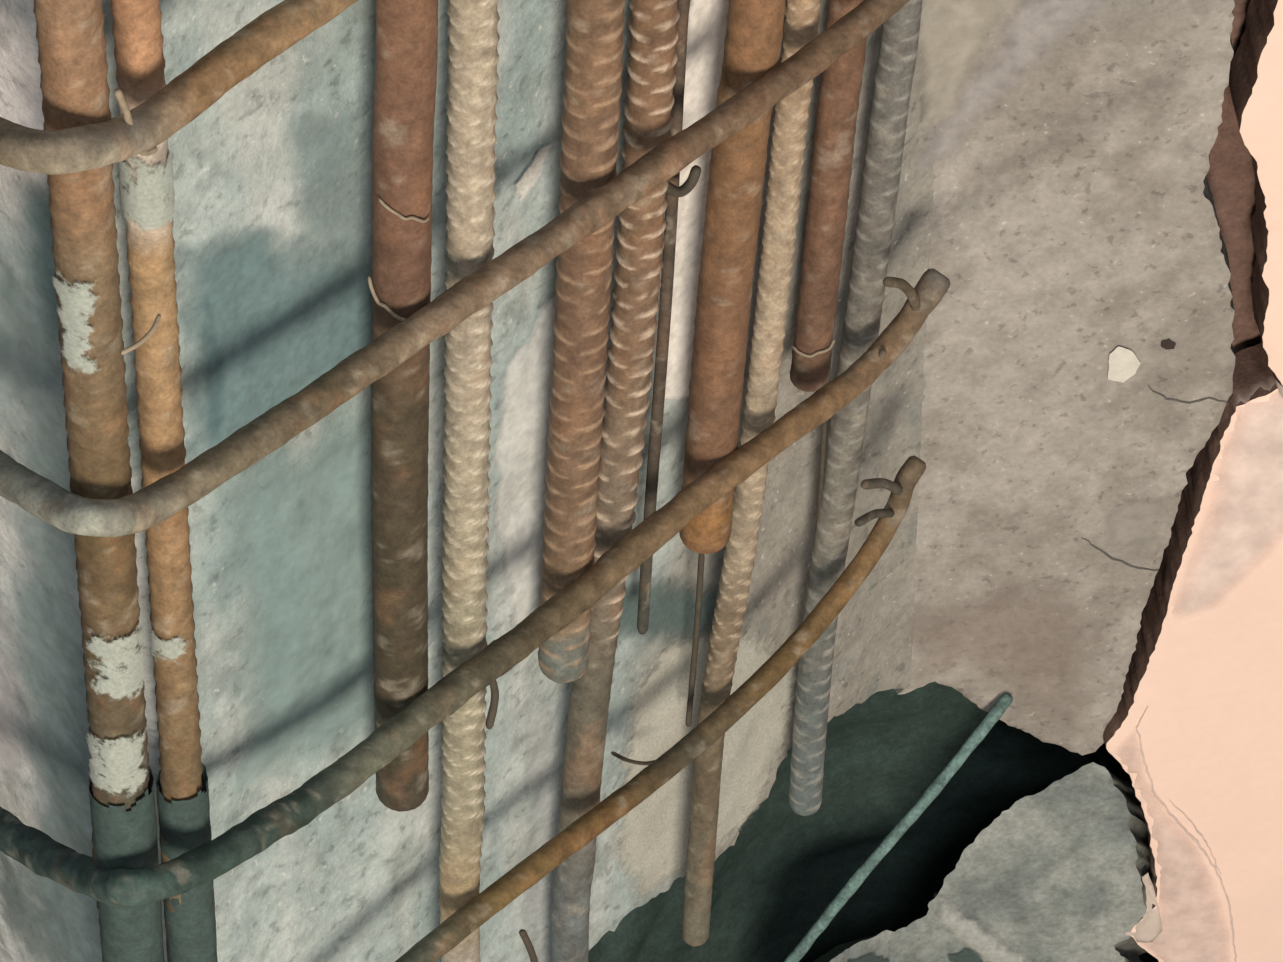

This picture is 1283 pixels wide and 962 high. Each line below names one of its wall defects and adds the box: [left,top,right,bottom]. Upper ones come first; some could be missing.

spalling [33,0,166,130]
spalling [47,139,186,499]
spalling [74,507,212,869]
spalling [376,687,487,924]
spalling [371,303,494,730]
spalling [371,0,500,342]
spalling [538,555,653,834]
spalling [540,172,680,606]
spalling [558,0,691,214]
spalling [679,462,769,725]
spalling [681,0,923,490]
spalling [550,615,1102,962]